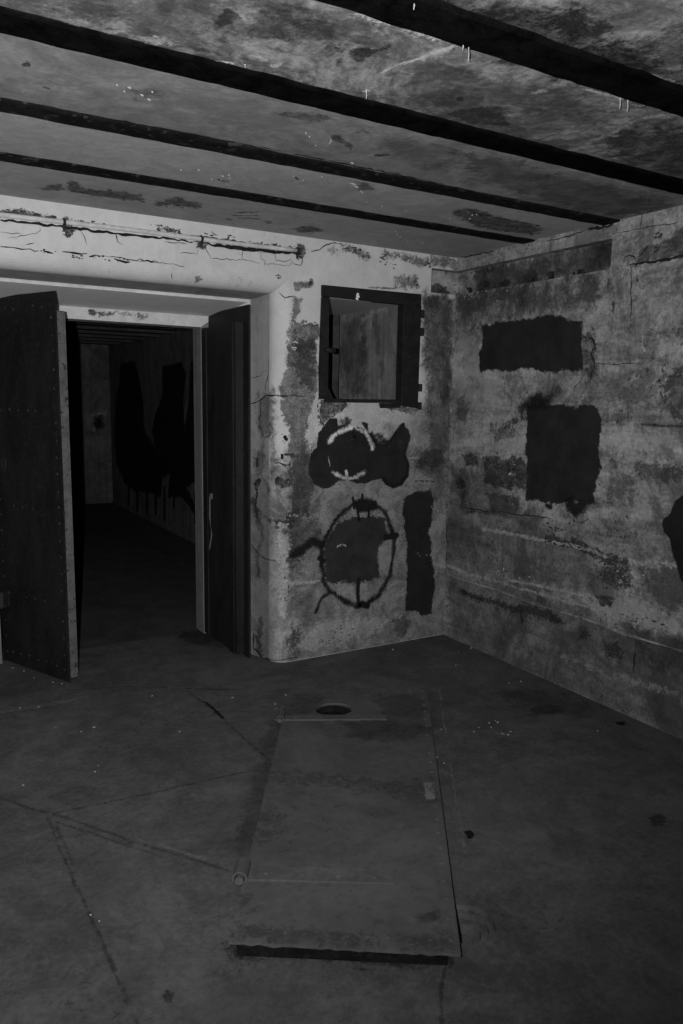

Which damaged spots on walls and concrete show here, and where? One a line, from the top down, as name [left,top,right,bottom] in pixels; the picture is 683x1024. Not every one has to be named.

crack [0,219,307,279]
peeling [275,226,536,661]
damp [422,243,615,423]
damp [412,449,683,737]